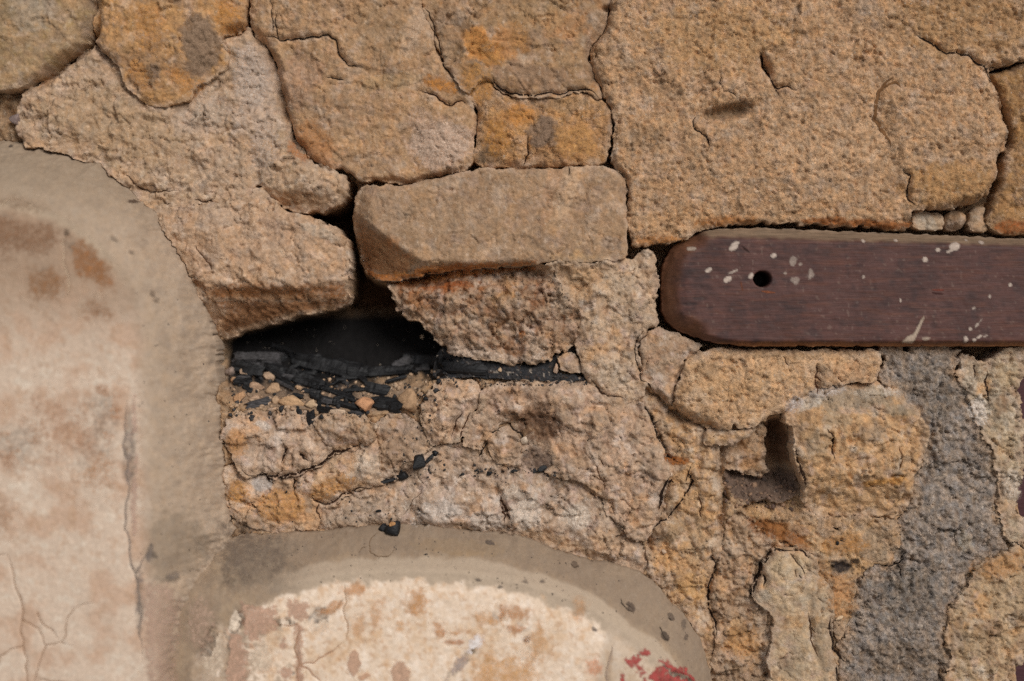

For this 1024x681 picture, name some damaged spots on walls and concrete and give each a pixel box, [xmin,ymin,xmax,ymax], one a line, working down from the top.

spalling [387,264,581,367]
crack [122,406,149,652]
crack [244,445,364,519]
crack [0,554,90,681]